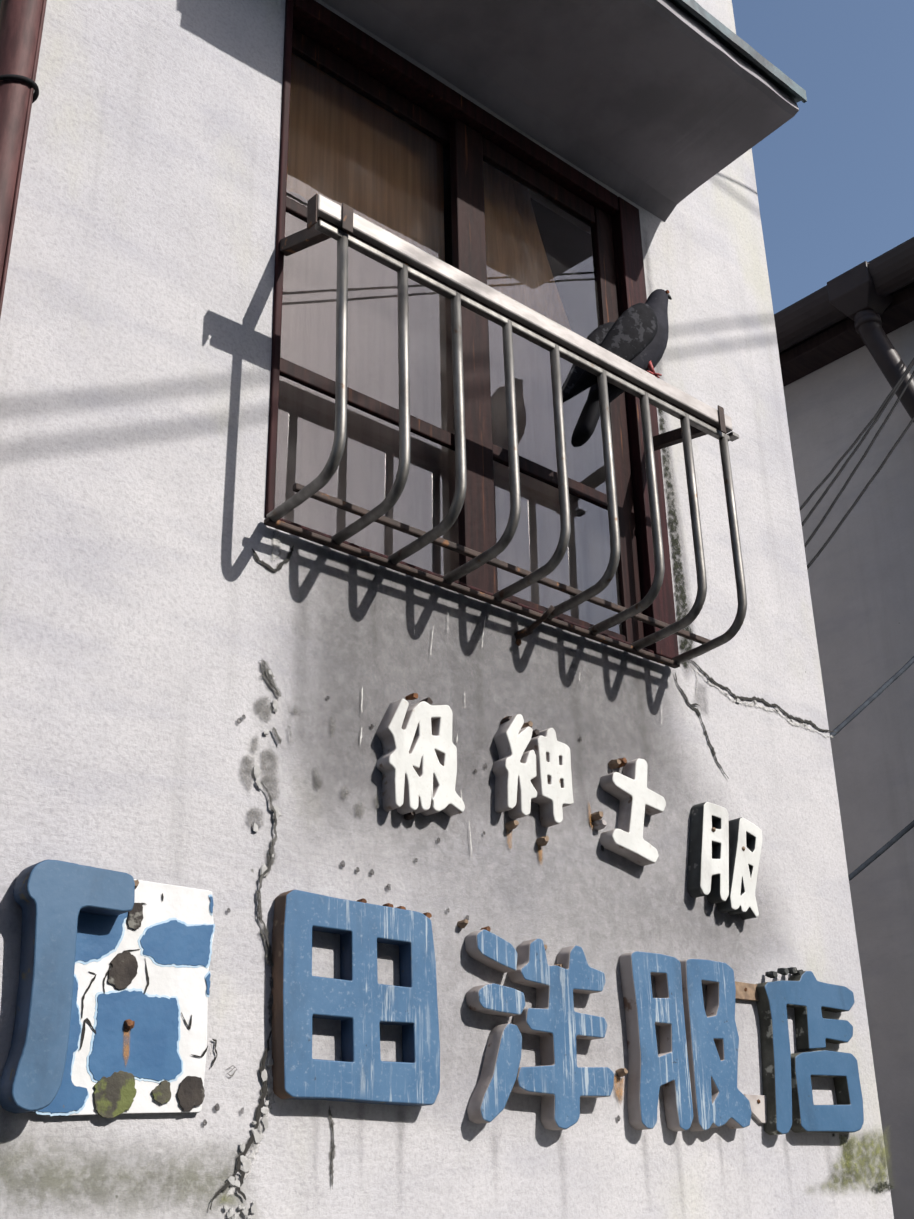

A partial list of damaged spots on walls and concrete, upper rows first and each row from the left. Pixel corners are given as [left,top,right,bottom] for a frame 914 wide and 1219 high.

crack [261,658,281,696]
crack [675,660,838,779]
crack [210,781,277,1210]